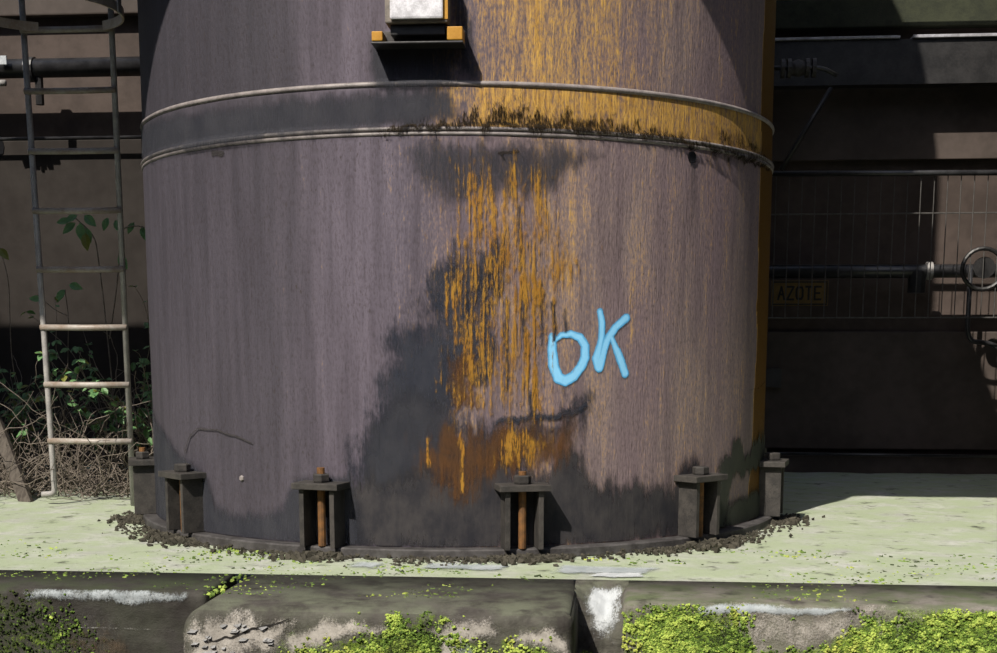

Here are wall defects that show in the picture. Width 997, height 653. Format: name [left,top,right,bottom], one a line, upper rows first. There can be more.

corrosion [420,151,579,502]
spalling [187,611,285,653]